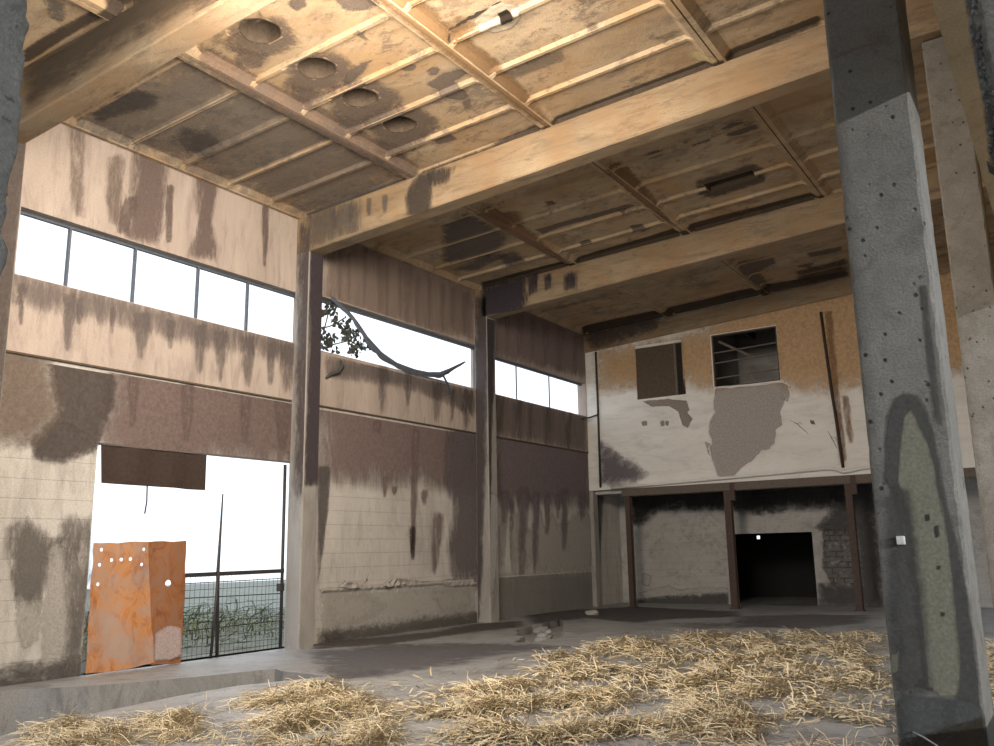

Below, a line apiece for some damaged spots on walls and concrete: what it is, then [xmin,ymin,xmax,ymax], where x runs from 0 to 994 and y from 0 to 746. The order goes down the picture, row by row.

spalling [474,2,521,33]
spalling [965,0,994,164]
leakage [107,154,174,242]
leakage [192,179,217,258]
leakage [32,364,115,462]
spalling [645,399,692,427]
peeling [705,381,791,477]
leakage [0,520,93,687]
leakage [318,467,330,557]
leakage [432,430,478,587]
leakage [313,488,863,679]
peeling [898,411,960,697]